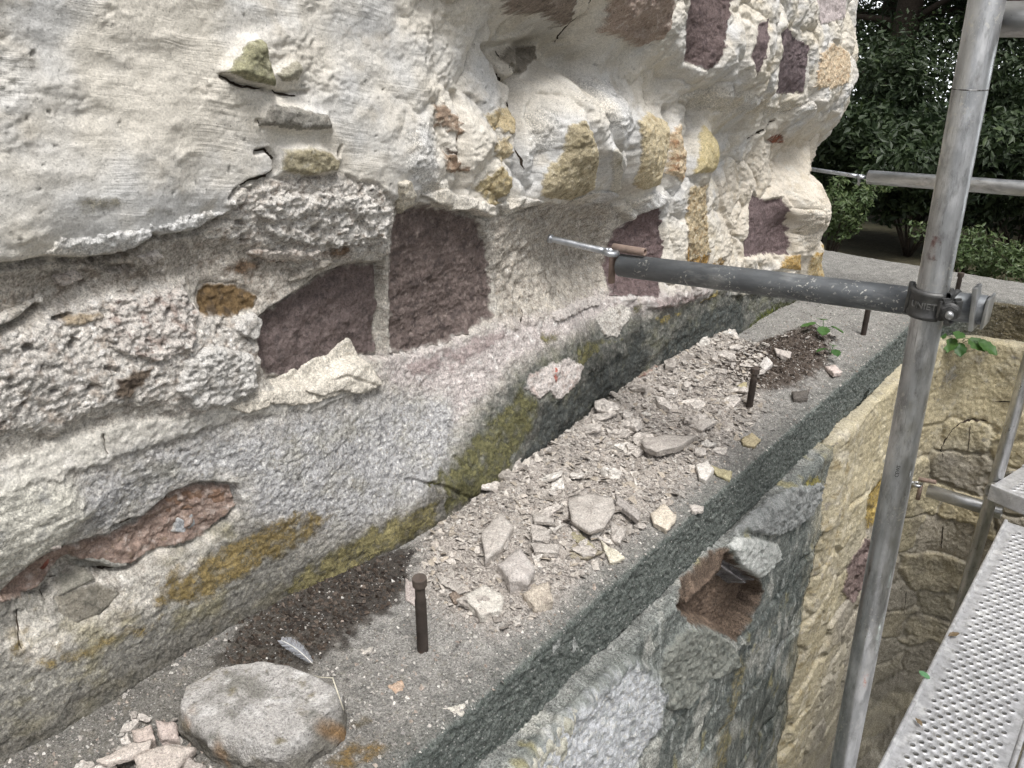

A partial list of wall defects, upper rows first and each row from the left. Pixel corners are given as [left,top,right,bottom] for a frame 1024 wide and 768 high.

spalling [0,293,44,325]
spalling [44,101,544,414]